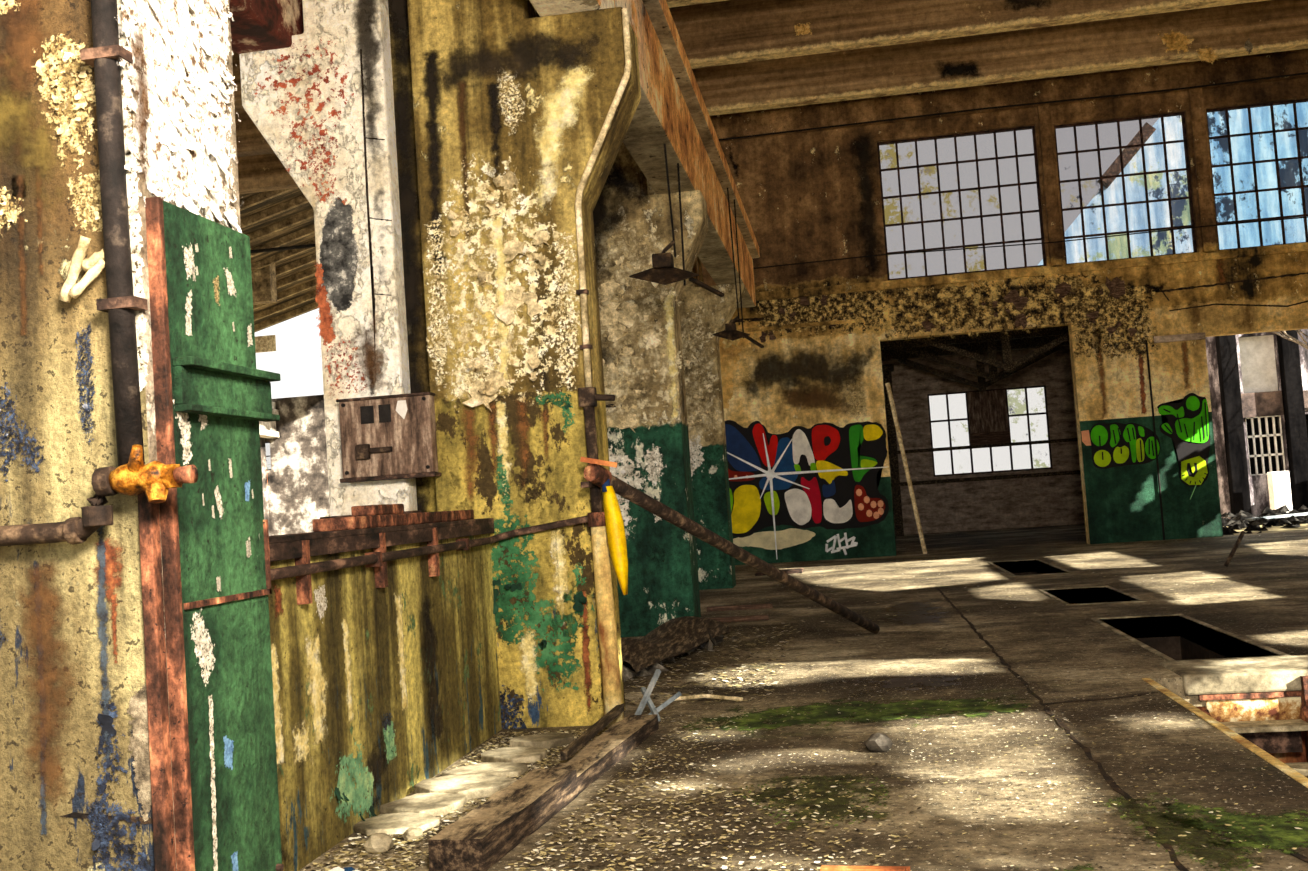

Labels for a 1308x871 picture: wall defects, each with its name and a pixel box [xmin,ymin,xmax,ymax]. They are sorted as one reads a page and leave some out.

corrosion [94,538,123,663]
peeling [117,0,242,391]
peeling [190,608,239,871]
water stain [416,477,427,512]
water stain [354,0,599,395]
peeling [423,152,582,433]
peeling [497,70,525,134]
peeling [491,454,596,729]
water stain [744,349,873,413]
peeling [597,211,1158,526]
crack [936,587,1308,871]